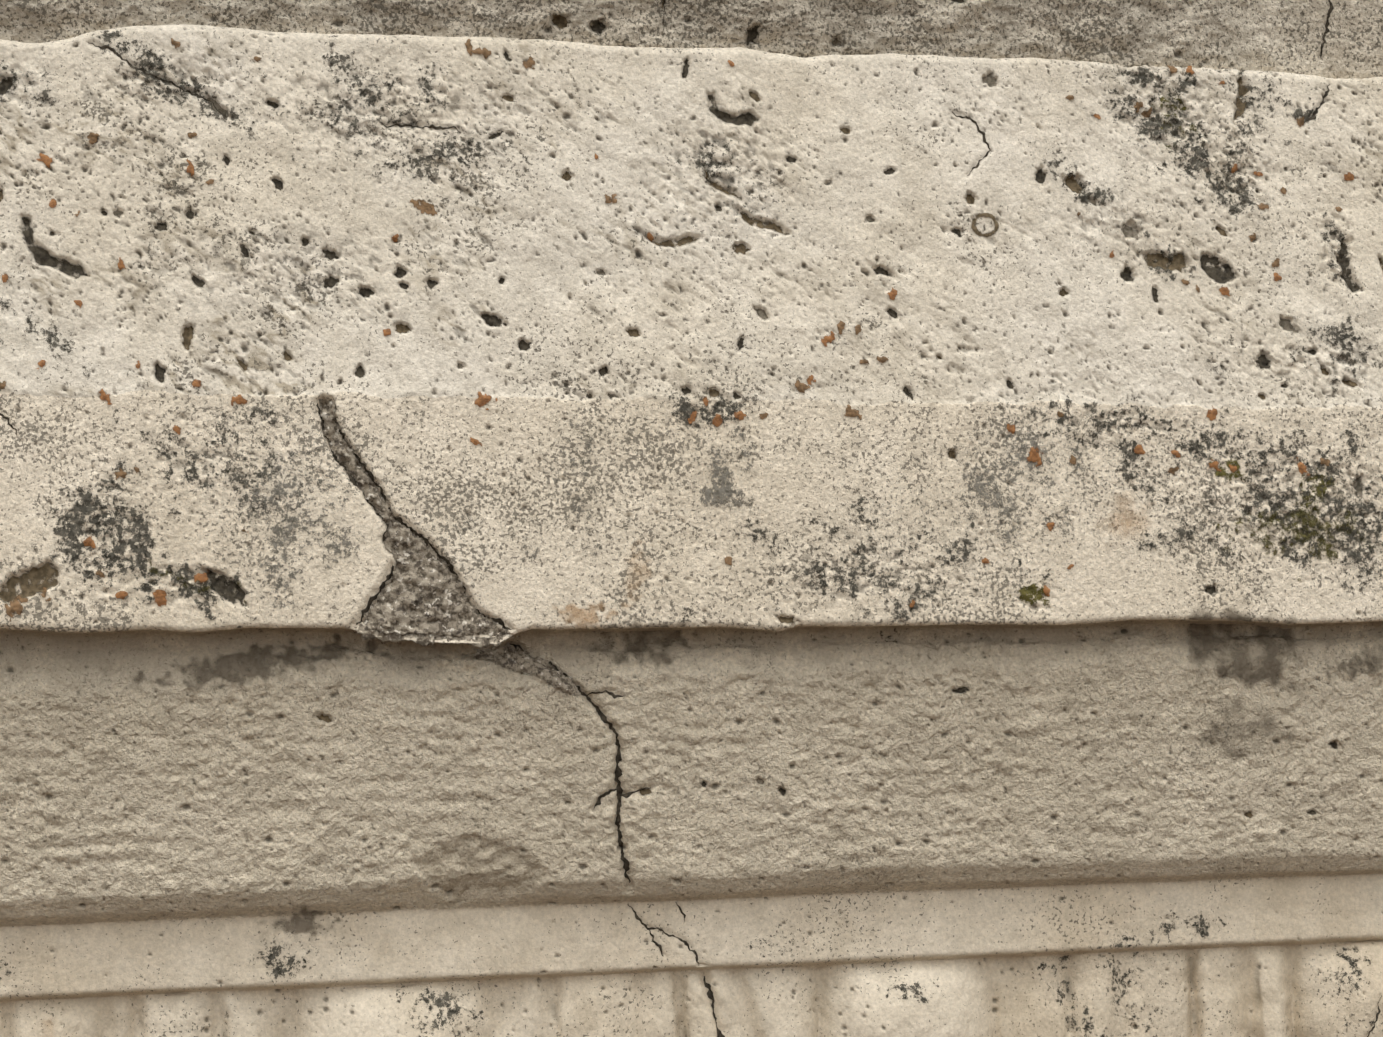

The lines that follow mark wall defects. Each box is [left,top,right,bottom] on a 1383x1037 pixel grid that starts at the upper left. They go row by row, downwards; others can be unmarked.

crack [317,399,725,1037]
crack [1367,995,1382,1037]